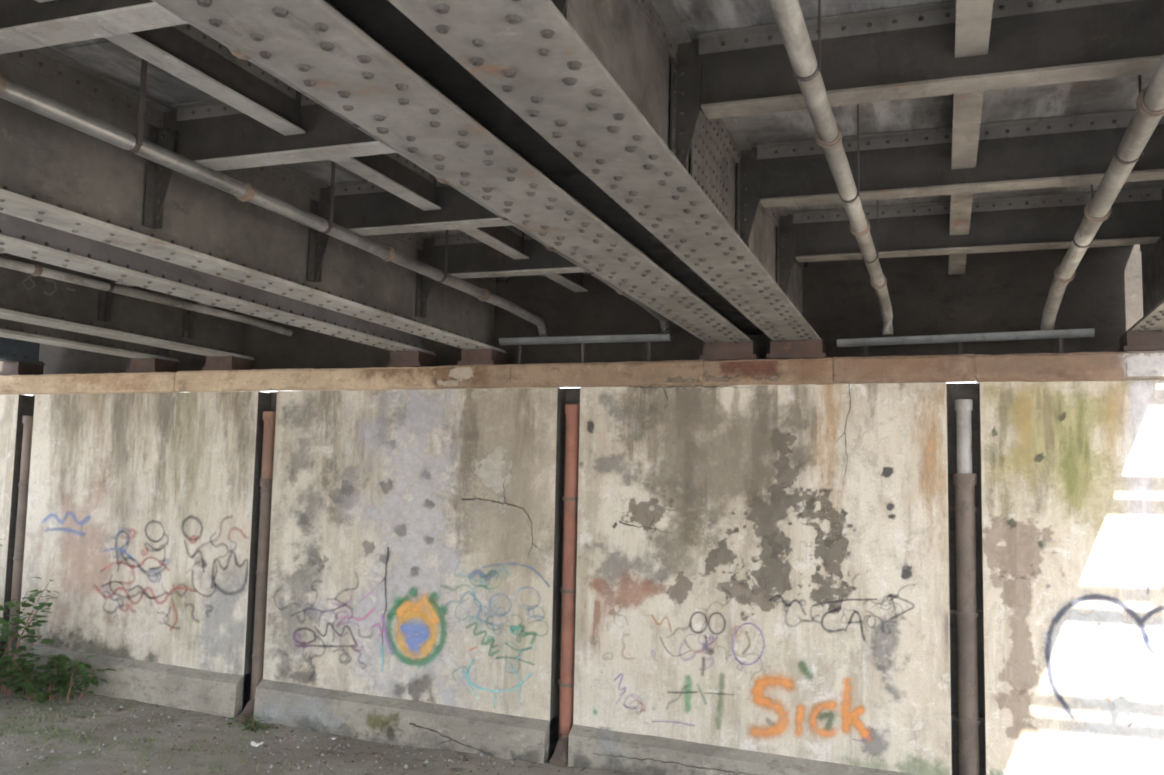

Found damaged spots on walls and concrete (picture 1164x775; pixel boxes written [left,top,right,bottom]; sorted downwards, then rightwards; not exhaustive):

rust [862,358,925,373]
rust [970,354,1115,372]
rust [794,360,836,452]
damp [1123,353,1164,593]
crack [462,477,540,555]
spalling [613,498,674,531]
peeling [705,428,856,620]
spalling [667,572,693,603]
spalling [901,565,912,579]